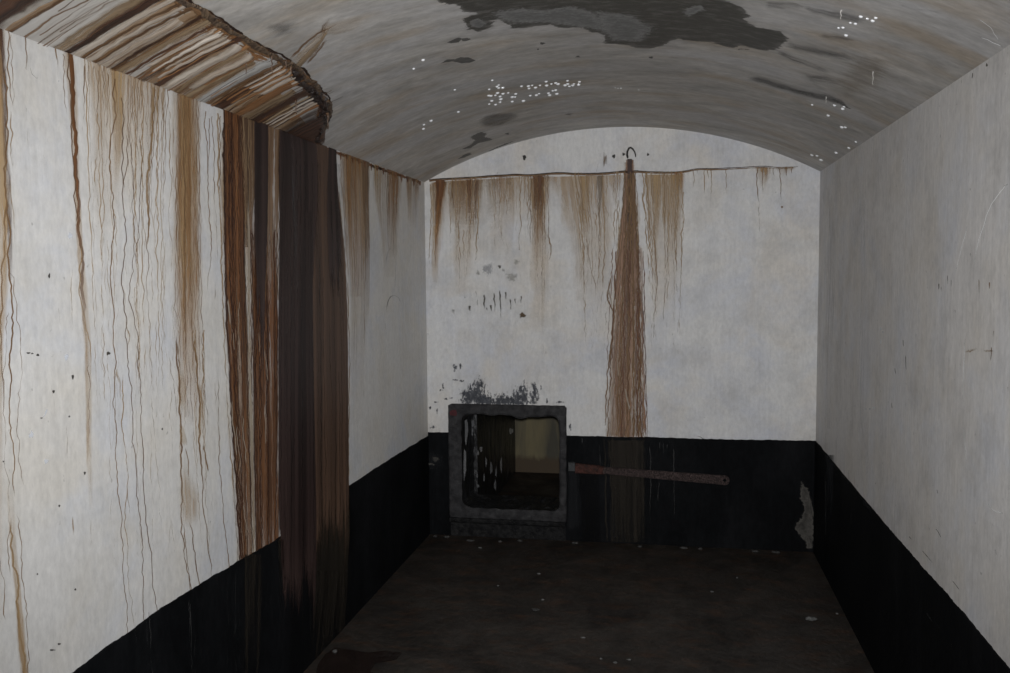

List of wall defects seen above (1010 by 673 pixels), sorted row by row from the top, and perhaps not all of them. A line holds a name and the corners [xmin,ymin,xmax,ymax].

leakage [438,0,788,58]
rust [0,29,22,489]
rust [55,48,280,633]
rust [328,148,712,437]
rust [756,167,793,211]
rust [568,462,730,485]
peeling [795,483,814,548]
rust [0,523,30,673]